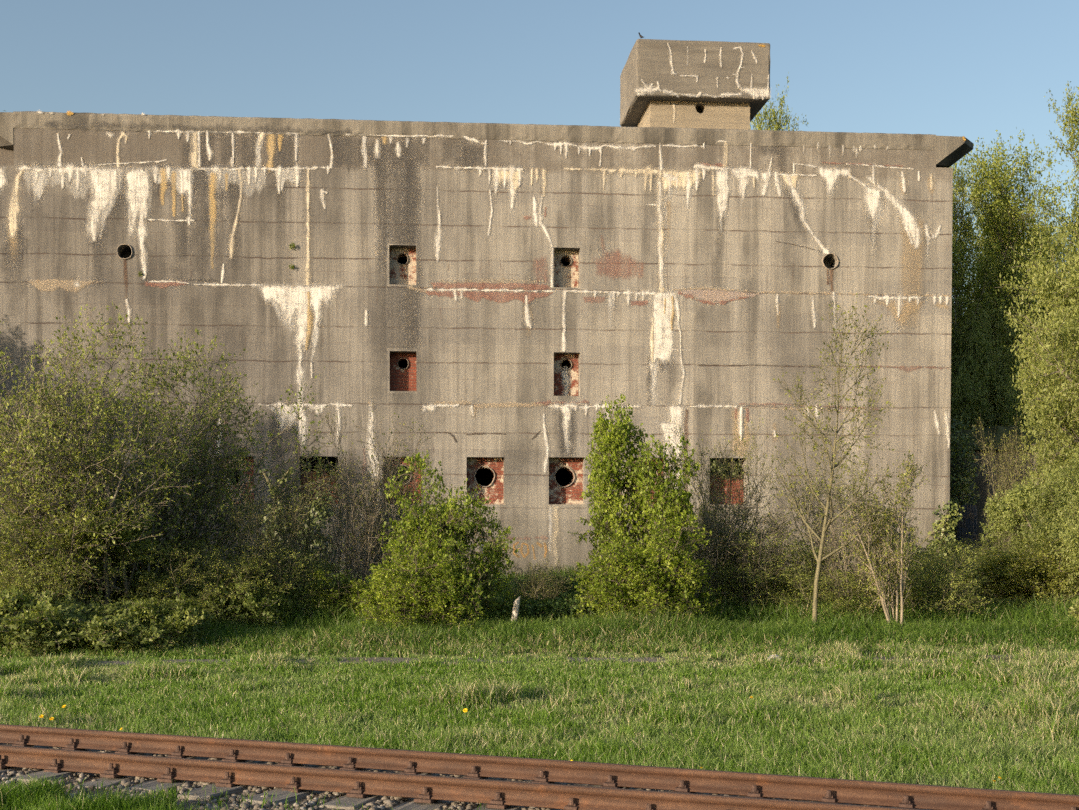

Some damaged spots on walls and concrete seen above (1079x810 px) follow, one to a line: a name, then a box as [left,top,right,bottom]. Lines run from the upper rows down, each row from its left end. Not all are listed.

leakage [636,48,770,123]
leakage [502,140,941,248]
leakage [0,112,676,447]
leakage [868,295,949,317]
leakage [367,401,382,516]
leakage [543,367,641,473]
leakage [660,405,749,490]